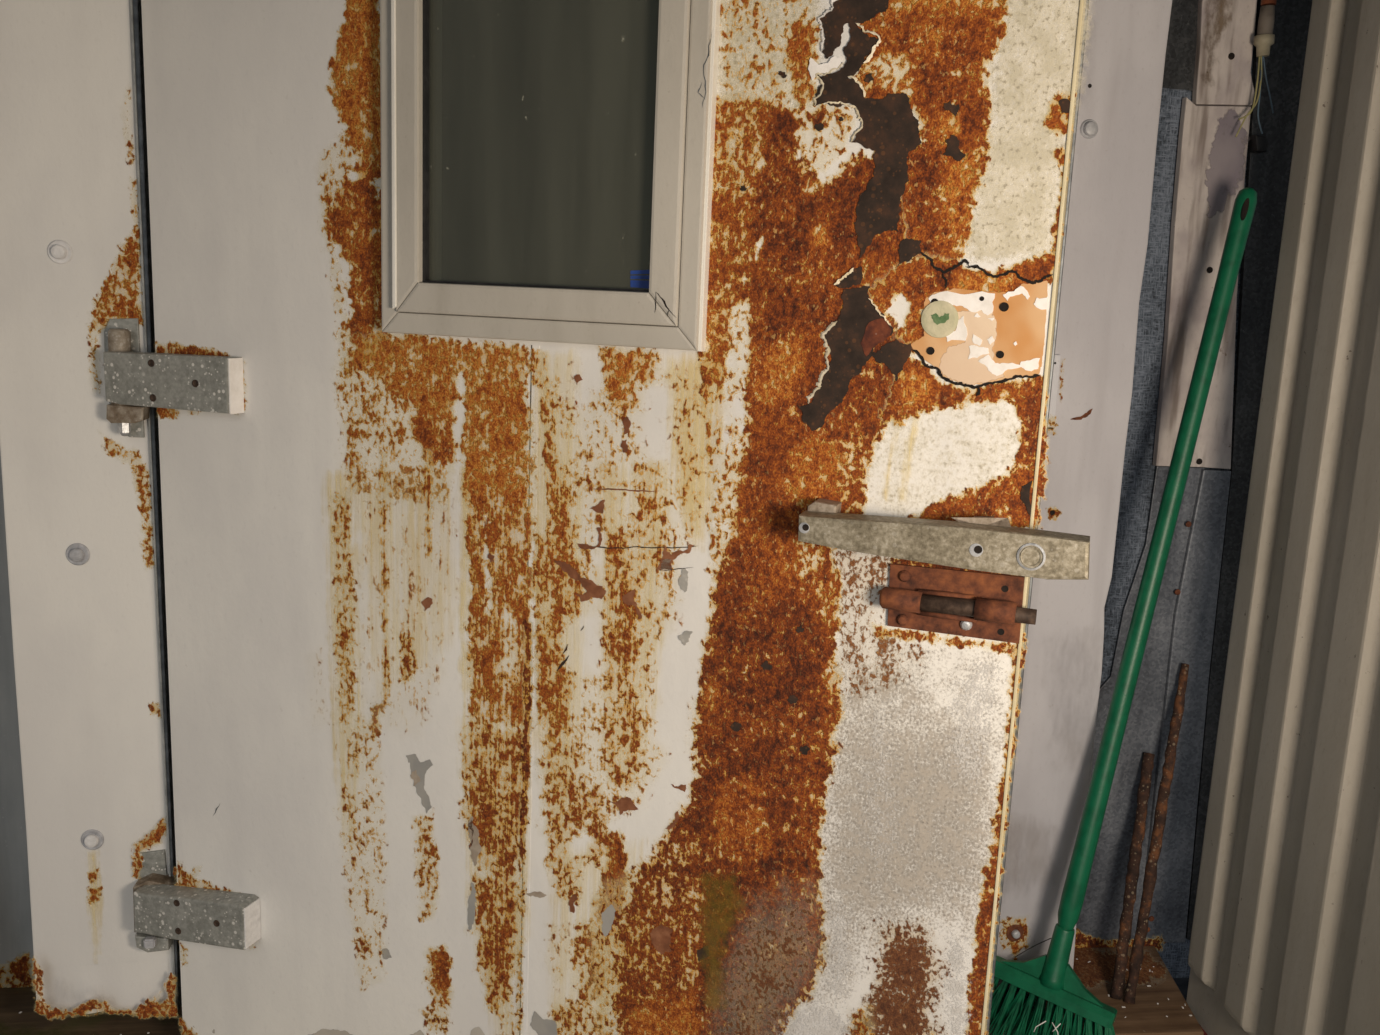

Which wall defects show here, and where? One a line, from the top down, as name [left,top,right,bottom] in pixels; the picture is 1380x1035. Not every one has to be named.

crack [921,252,1053,289]
peeling [911,281,1048,385]
crack [911,349,1040,397]
rust [104,437,155,569]
rust [317,0,1077,1035]
peeling [406,754,433,813]
rust [173,865,231,892]
rust [1073,928,1167,988]
rust [0,943,197,1035]